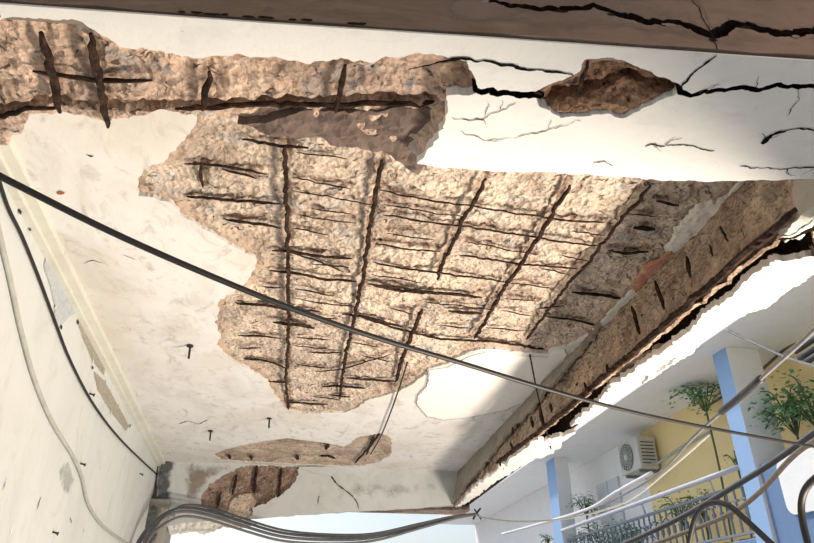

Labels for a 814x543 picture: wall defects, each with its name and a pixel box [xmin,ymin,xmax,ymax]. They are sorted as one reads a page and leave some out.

crack [408,57,579,142]
crack [480,0,814,144]
crack [646,137,715,151]
crack [740,166,814,176]
spalling [0,19,814,431]
spalling [168,433,392,535]
spalling [451,389,606,508]